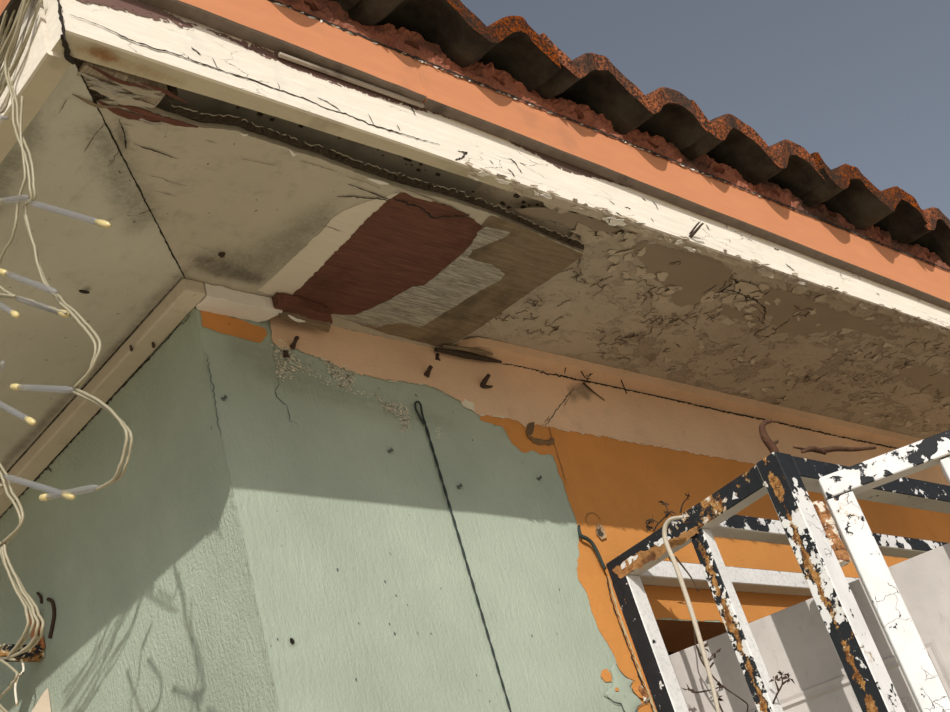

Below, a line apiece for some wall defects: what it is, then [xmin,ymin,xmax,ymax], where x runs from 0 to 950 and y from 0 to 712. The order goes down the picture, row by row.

peeling [79,0,450,119]
peeling [510,141,627,187]
crack [269,0,950,271]
crack [0,0,467,480]
peeling [258,193,510,328]
peeling [465,162,950,340]
crack [705,278,771,319]
crack [0,316,189,518]
peeling [271,339,410,432]
spalling [596,524,606,540]
rust [612,526,699,578]